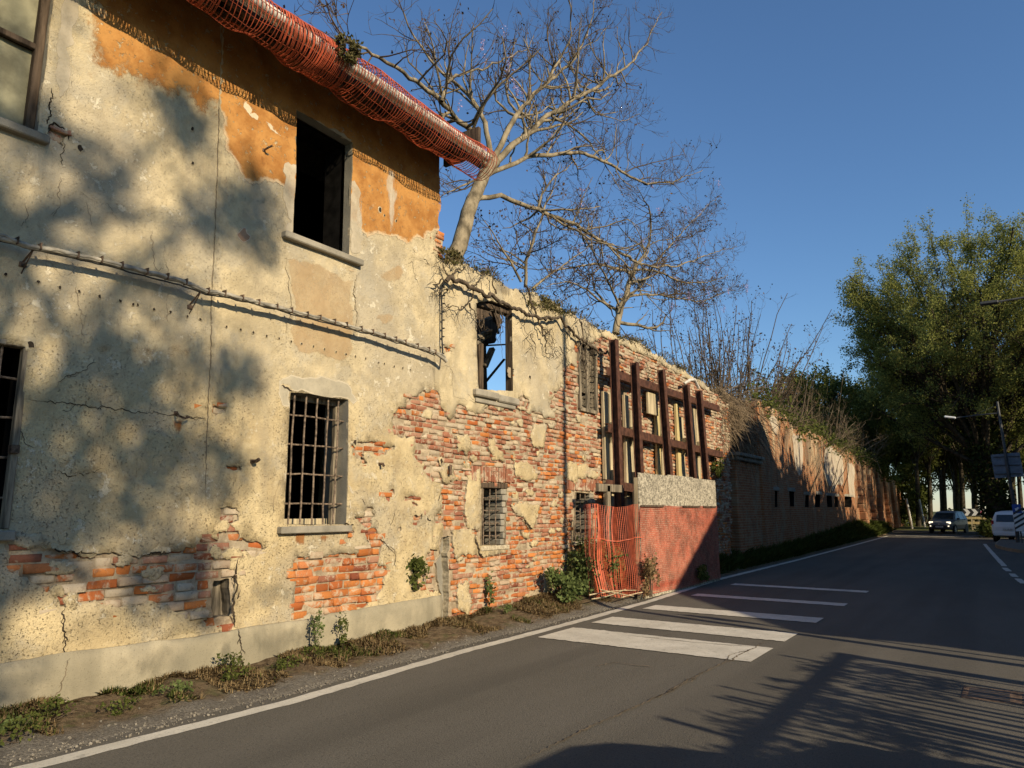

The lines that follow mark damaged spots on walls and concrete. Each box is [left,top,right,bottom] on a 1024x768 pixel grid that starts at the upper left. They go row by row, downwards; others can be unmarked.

peeling [90,0,444,259]
crack [22,16,225,506]
flaking render [351,336,732,617]
crack [55,606,72,696]
flaking render [0,506,266,632]
crack [231,558,245,664]
flaking render [286,507,391,620]